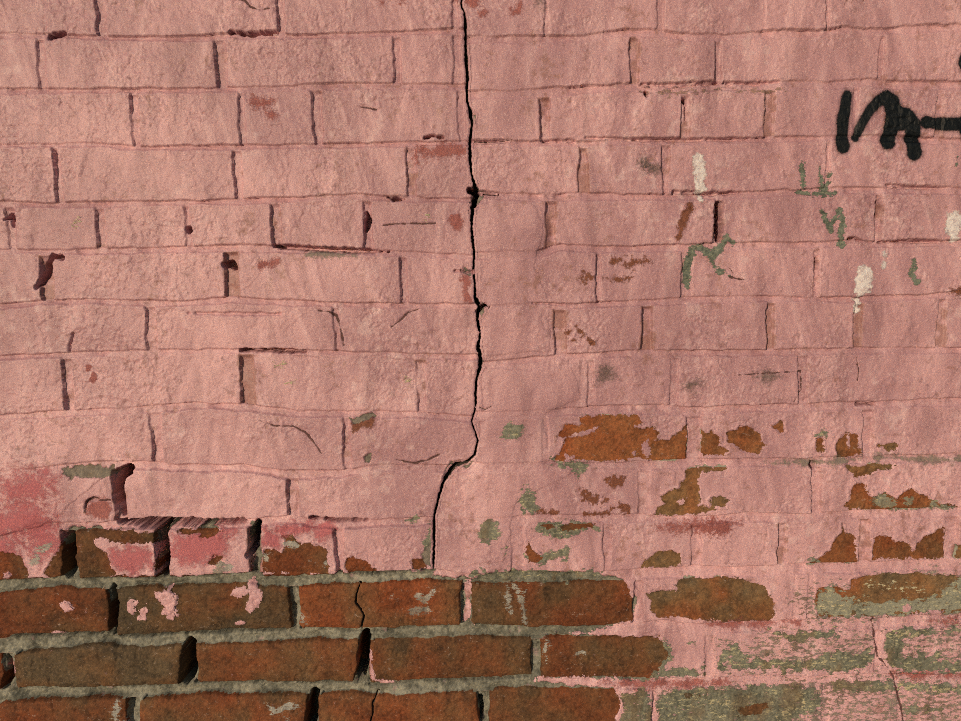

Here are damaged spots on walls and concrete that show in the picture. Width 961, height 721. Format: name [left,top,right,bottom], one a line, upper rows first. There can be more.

crack [396,0,511,569]
spalling [62,463,130,480]
crack [259,420,322,454]
spalling [349,413,377,424]
peeling [499,421,524,442]
peeling [549,413,767,516]
peeling [814,429,958,511]
peeling [0,484,961,721]